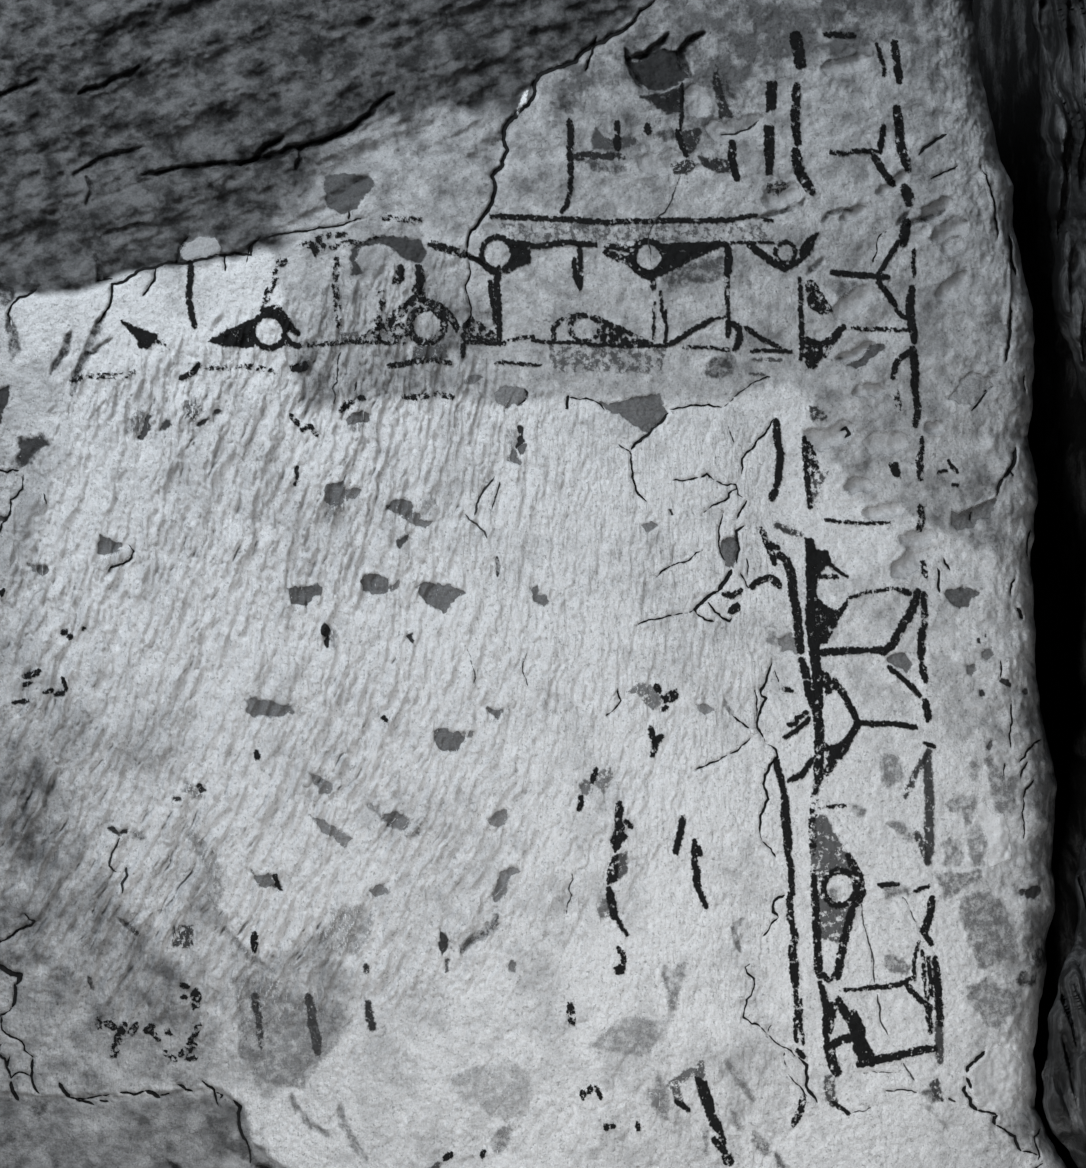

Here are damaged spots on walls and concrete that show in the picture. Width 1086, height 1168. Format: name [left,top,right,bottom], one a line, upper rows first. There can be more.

crack [465,0,703,333]
spalling [324,173,374,214]
spalling [349,235,427,275]
spalling [0,284,15,306]
spalling [565,393,667,432]
crack [618,376,774,625]
crack [0,913,269,1168]
crack [852,1063,917,1113]
crack [948,1051,1043,1168]